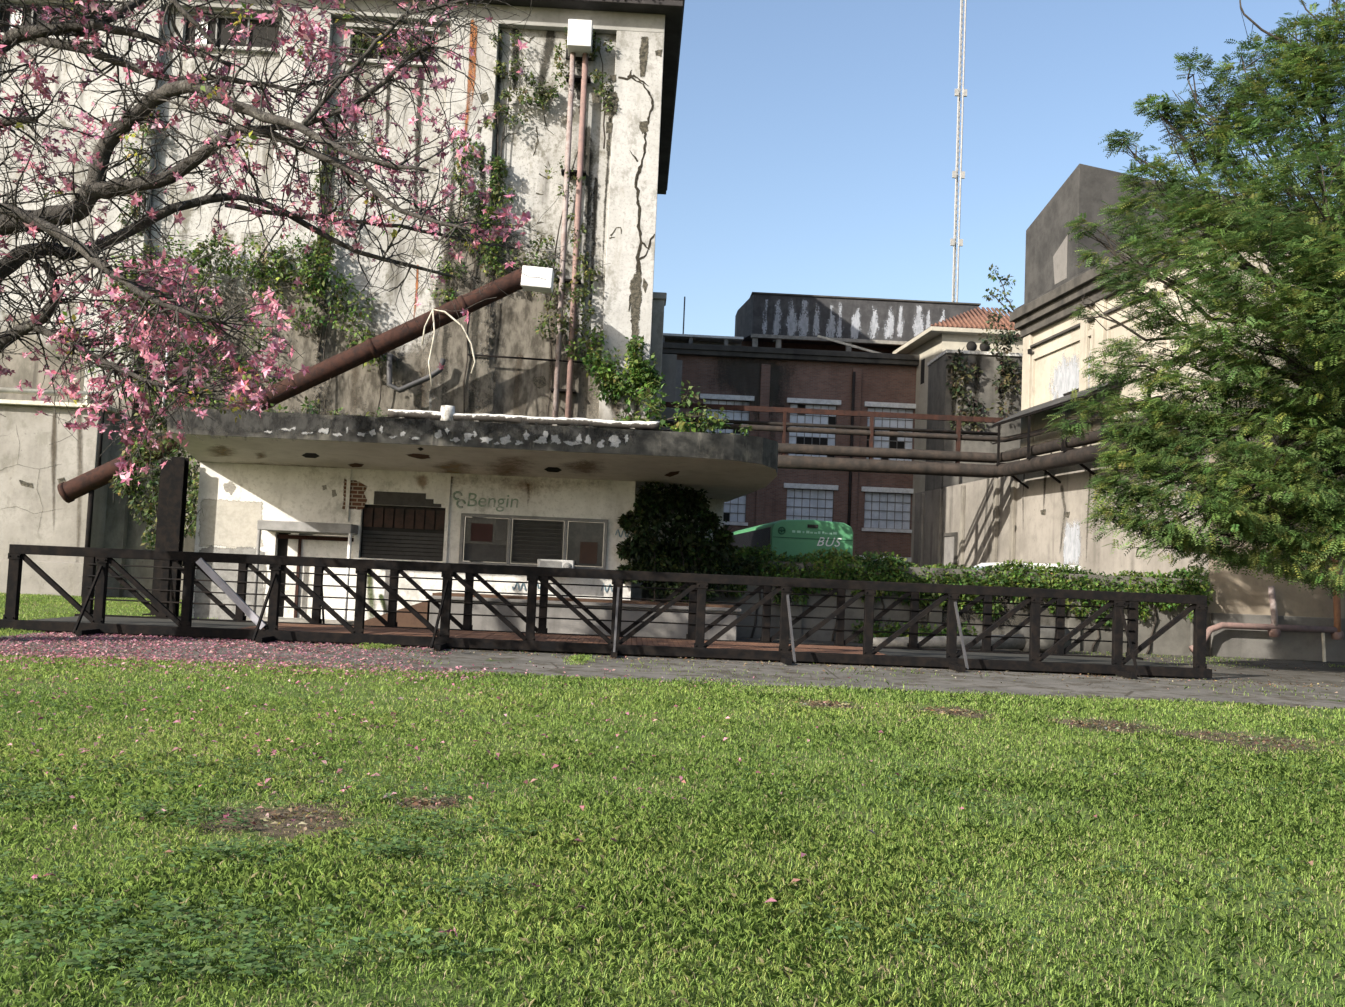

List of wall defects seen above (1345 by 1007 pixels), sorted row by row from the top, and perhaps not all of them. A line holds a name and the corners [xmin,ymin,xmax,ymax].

water stain [537,30,555,89]
water stain [444,126,456,303]
water stain [474,28,520,289]
water stain [575,60,611,309]
crack [618,70,655,331]
peeling [173,274,377,409]
water stain [164,309,640,445]
peeling [265,197,629,459]
flaking render [322,463,367,510]